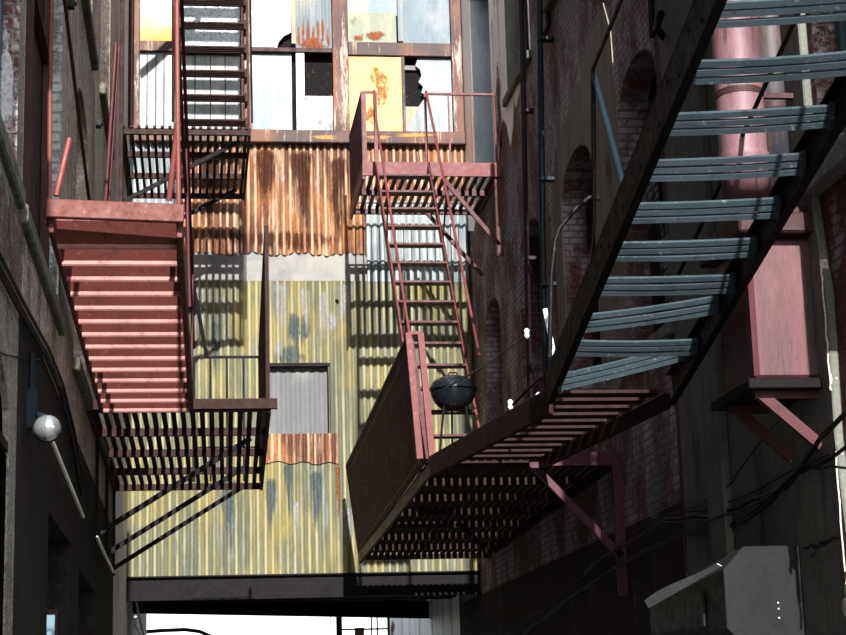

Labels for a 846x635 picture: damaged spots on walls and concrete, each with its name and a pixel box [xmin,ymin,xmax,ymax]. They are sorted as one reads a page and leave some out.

corrosion [297,18,330,48]
peeling [0,28,14,127]
corrosion [366,67,388,120]
corrosion [202,159,219,227]
corrosion [221,150,344,250]